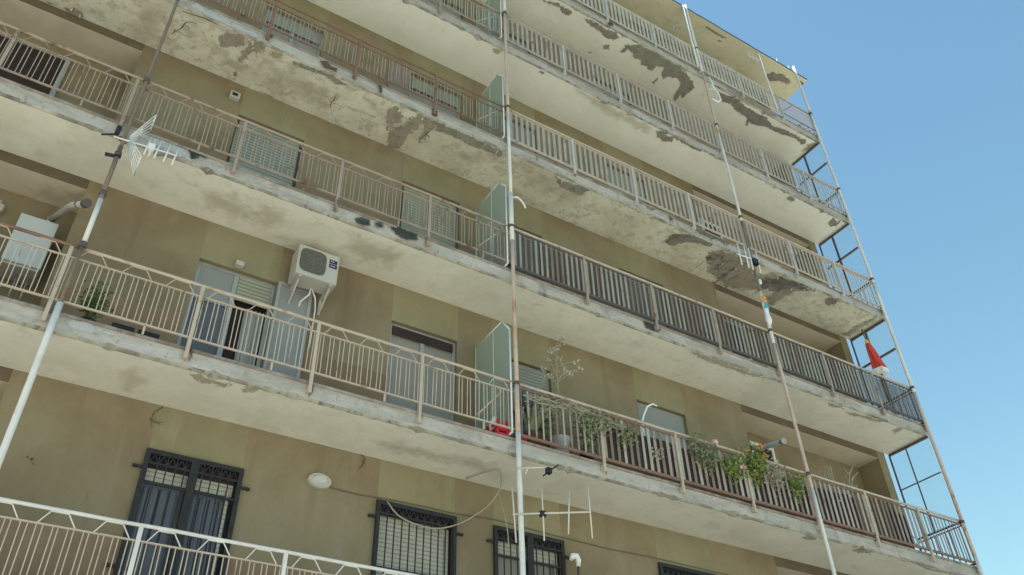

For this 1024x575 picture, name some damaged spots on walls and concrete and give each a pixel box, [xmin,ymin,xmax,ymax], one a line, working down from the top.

peeling [218,32,346,85]
peeling [585,19,695,101]
spalling [767,72,804,85]
peeling [386,106,503,157]
spalling [719,92,806,145]
spalling [663,215,738,284]
spalling [753,276,816,292]